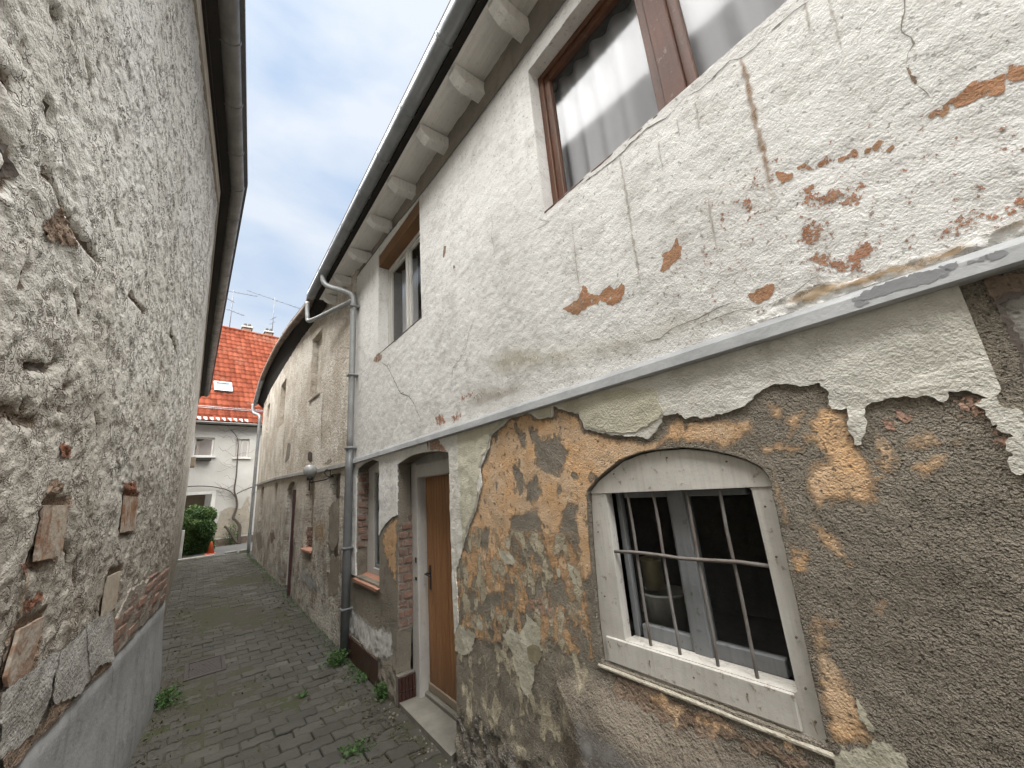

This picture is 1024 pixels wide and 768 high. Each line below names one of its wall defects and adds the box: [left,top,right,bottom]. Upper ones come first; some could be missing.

crack [901,0,929,96]
peeling [918,64,1024,131]
spalling [44,204,79,249]
peeling [660,120,1008,324]
leakage [792,246,962,301]
spalling [19,478,73,573]
spalling [118,481,140,537]
spalling [454,273,1024,768]
spalling [328,472,413,706]
flaking render [0,562,169,768]